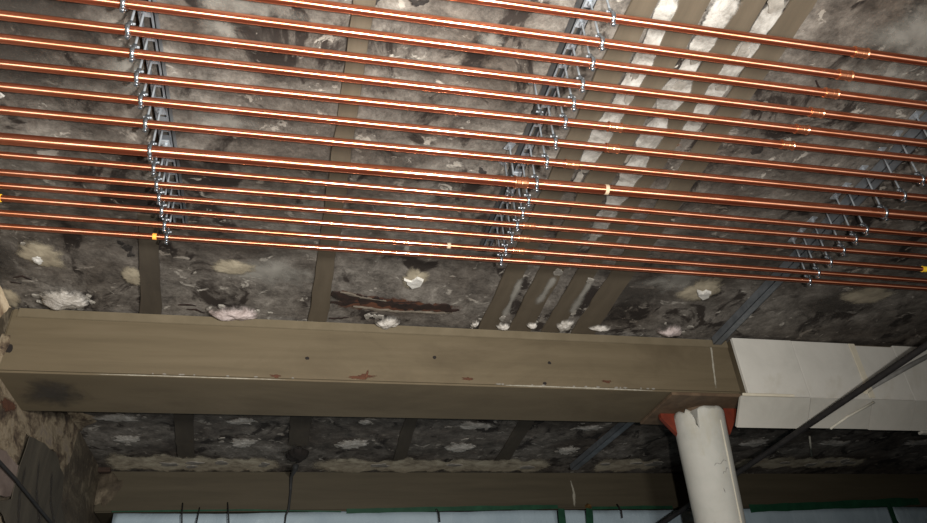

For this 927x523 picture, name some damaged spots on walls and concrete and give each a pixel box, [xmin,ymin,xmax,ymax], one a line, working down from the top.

peeling [0,286,10,317]
peeling [0,379,78,472]